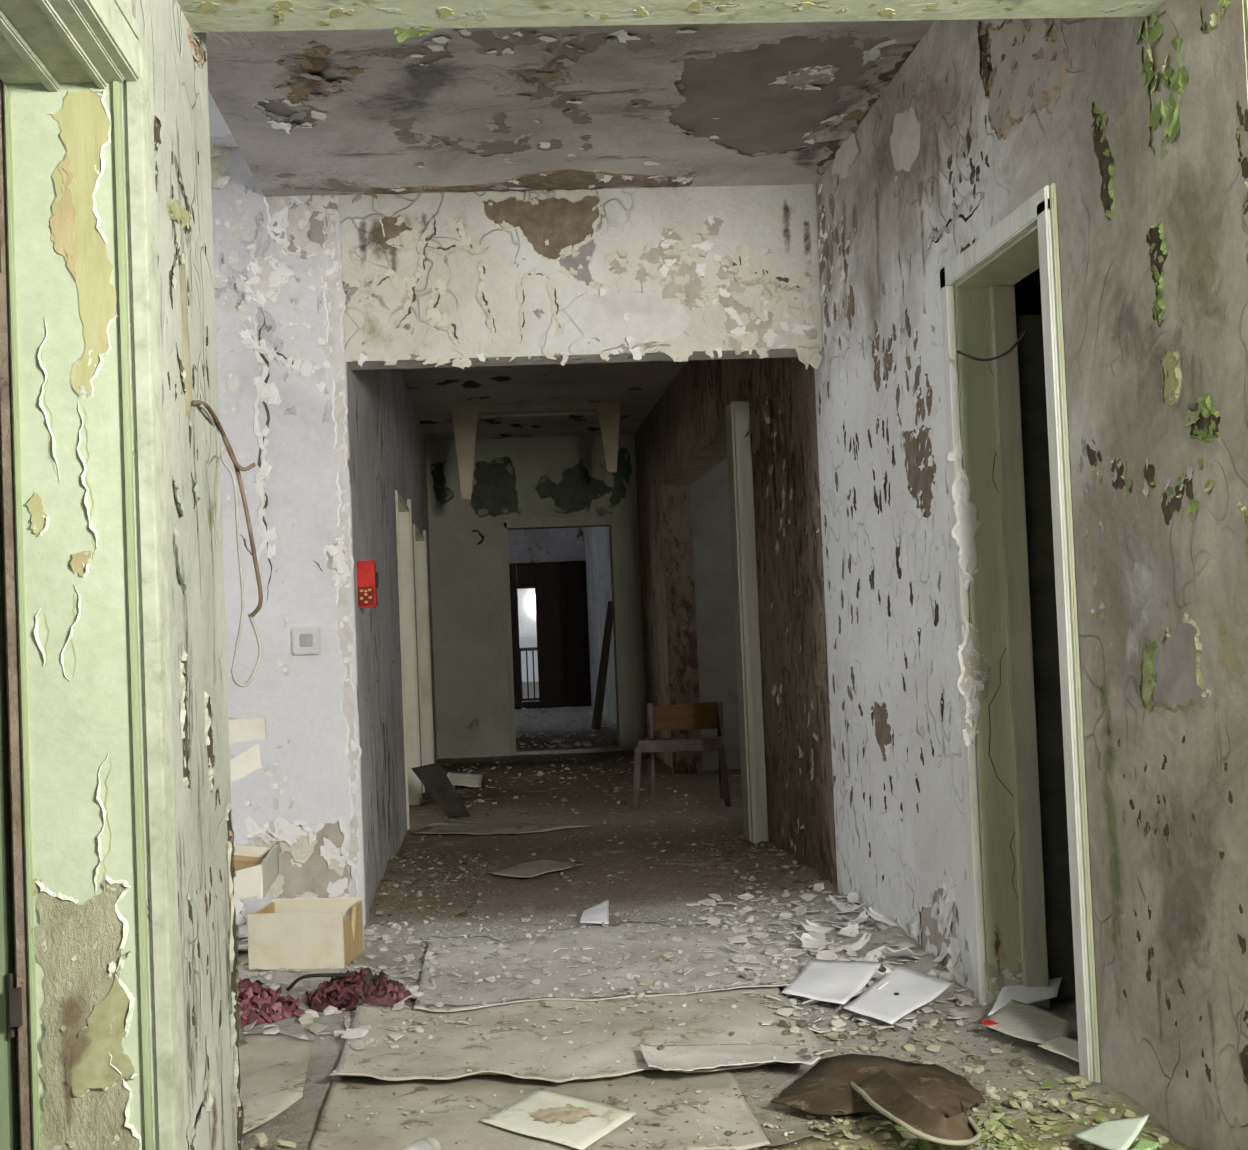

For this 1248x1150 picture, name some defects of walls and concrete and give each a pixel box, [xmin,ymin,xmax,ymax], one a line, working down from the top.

peeling [47,85,119,399]
crack [372,214,565,346]
peeling [363,85,981,591]
peeling [661,30,896,157]
peeling [931,0,1069,199]
peeling [1091,102,1115,221]
peeling [1136,10,1188,166]
peeling [153,116,373,1150]
peeling [744,382,917,857]
peeling [832,667,934,822]
peeling [957,615,992,747]
peeling [31,875,143,1150]